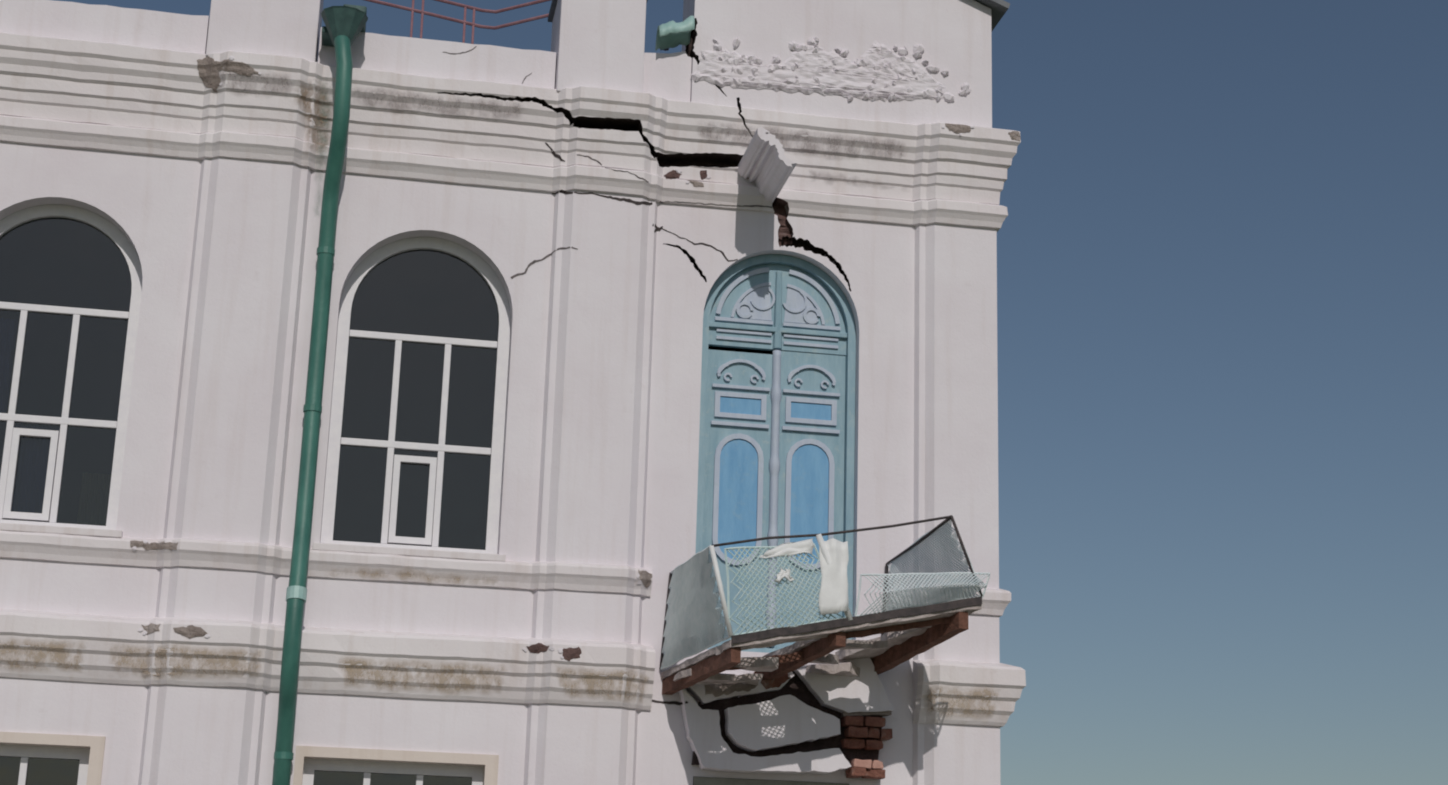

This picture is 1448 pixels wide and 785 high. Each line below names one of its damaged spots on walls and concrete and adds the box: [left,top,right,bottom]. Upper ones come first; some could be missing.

spalling [197,56,261,93]
water stain [234,75,327,145]
crack [439,18,851,292]
spalling [130,540,178,551]
spalling [138,623,210,639]
water stain [1,642,79,668]
water stain [118,648,247,675]
water stain [345,660,408,687]
water stain [424,666,500,690]
spalling [522,643,582,661]
water stain [563,672,635,697]
flaking render [841,711,893,779]